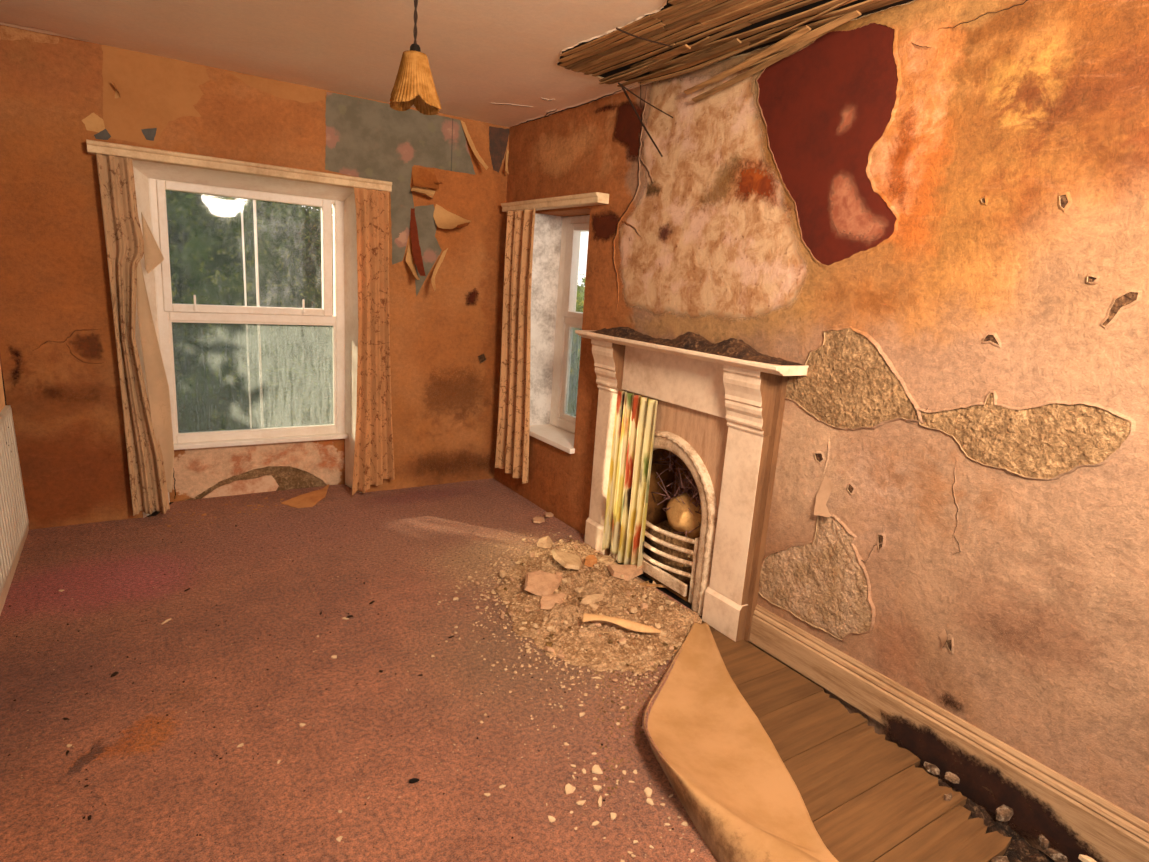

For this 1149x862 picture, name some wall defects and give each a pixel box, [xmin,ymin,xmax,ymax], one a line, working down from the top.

peeling [619,20,902,320]
water stain [10,348,22,382]
water stain [70,334,102,358]
flaking render [785,326,1136,481]
flaking render [1100,289,1143,329]
flaking render [171,462,330,502]
flaking render [758,451,876,641]
water stain [881,713,1102,862]